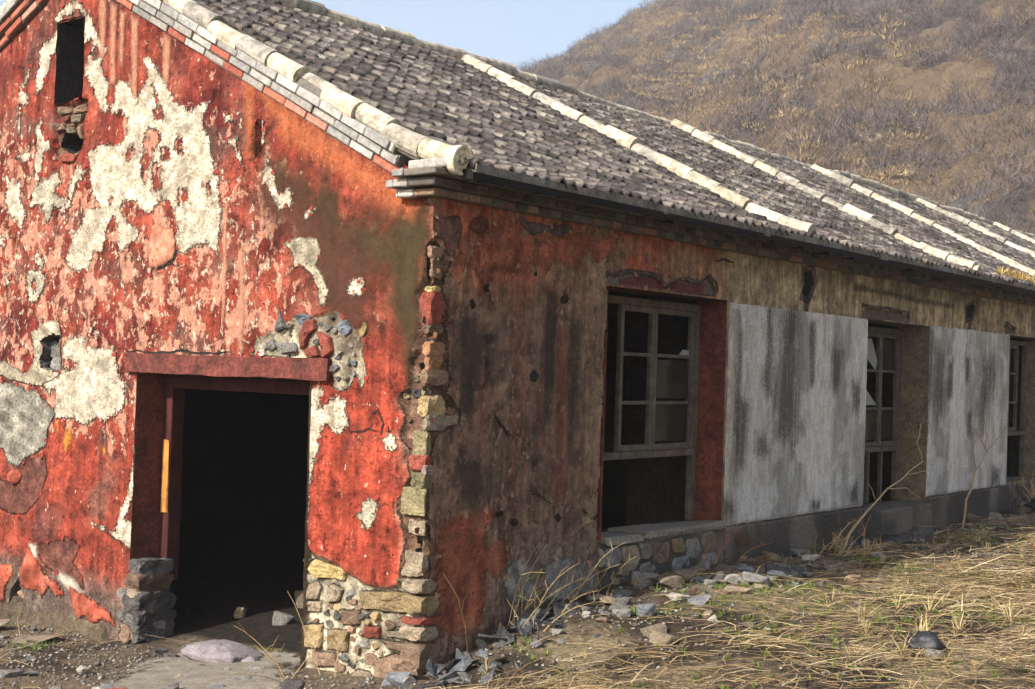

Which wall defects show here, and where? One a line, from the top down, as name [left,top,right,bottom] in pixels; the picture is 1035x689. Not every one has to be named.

peeling [4,0,224,274]
peeling [222,111,316,221]
damp [245,83,424,369]
peeling [0,317,125,516]
spalling [0,431,177,644]
spalling [249,236,369,524]
spalling [302,213,595,678]
damp [545,292,556,412]
damp [733,301,817,471]
damp [829,337,845,387]
damp [852,379,863,414]
damp [927,330,998,437]